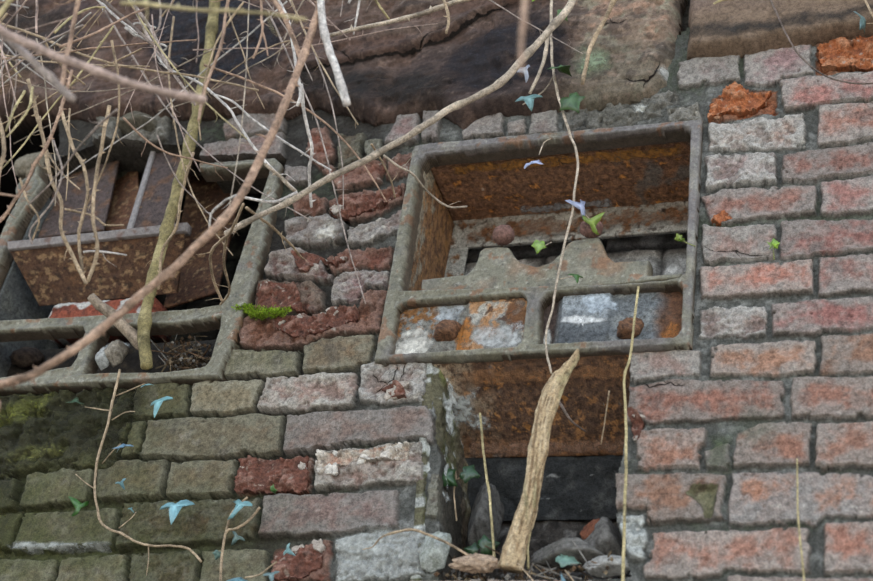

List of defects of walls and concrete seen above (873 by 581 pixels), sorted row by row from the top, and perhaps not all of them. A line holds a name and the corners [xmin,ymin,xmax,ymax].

spalling [817,35,873,74]
spalling [707,81,772,123]
rust [455,146,679,174]
rust [510,216,586,236]
rust [602,206,688,229]
spalling [291,250,348,275]
spalling [254,281,359,339]
water stain [0,384,139,534]
spalling [234,441,410,497]
water stain [14,542,110,552]
spalling [271,539,326,581]